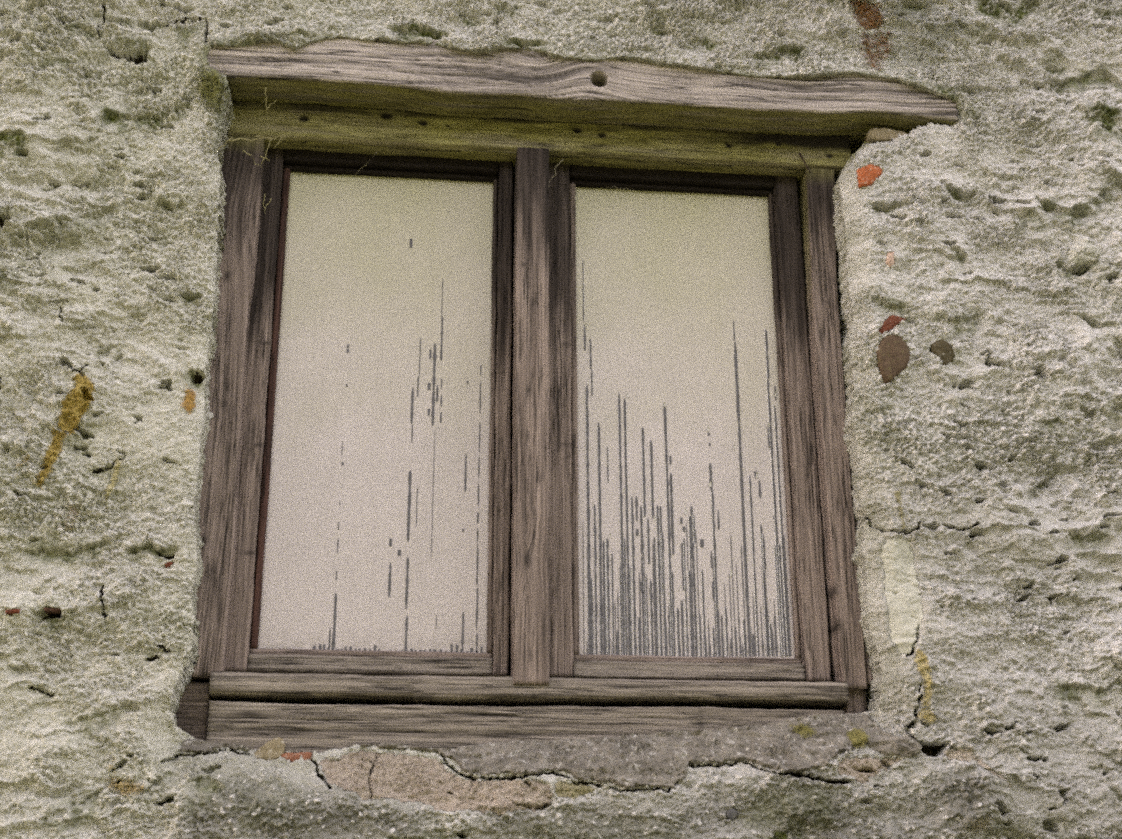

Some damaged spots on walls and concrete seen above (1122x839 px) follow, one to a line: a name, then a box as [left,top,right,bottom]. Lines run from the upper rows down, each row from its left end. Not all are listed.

corrosion [851,0,890,70]
crack [312,760,332,789]
spalling [319,748,596,816]
crack [446,761,847,793]